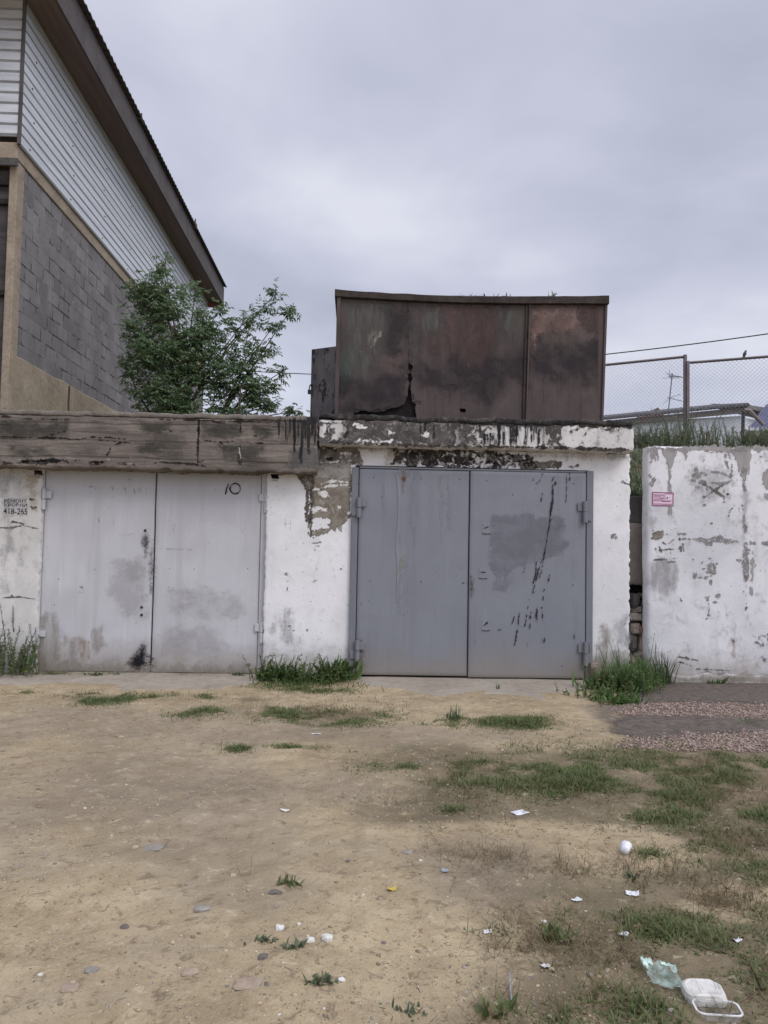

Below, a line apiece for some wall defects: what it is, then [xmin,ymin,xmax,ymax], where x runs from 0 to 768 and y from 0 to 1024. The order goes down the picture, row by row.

rust [530,305,599,350]
damp [208,417,331,468]
flaking render [298,420,587,551]
damp [648,447,687,492]
peeling [691,450,735,517]
spalling [651,530,768,620]